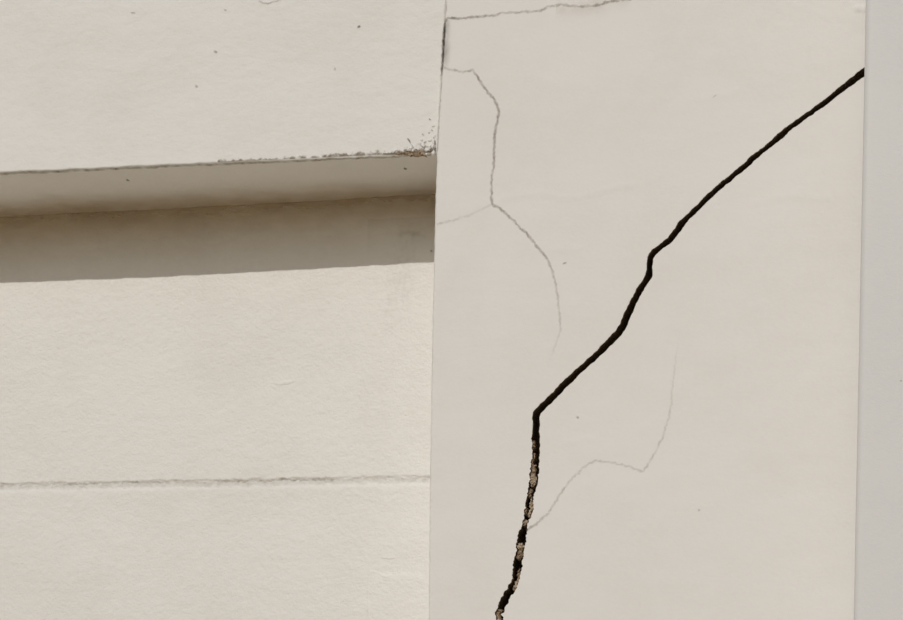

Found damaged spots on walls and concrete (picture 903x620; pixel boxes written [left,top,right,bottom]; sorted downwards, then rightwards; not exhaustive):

crack [495,67,865,620]